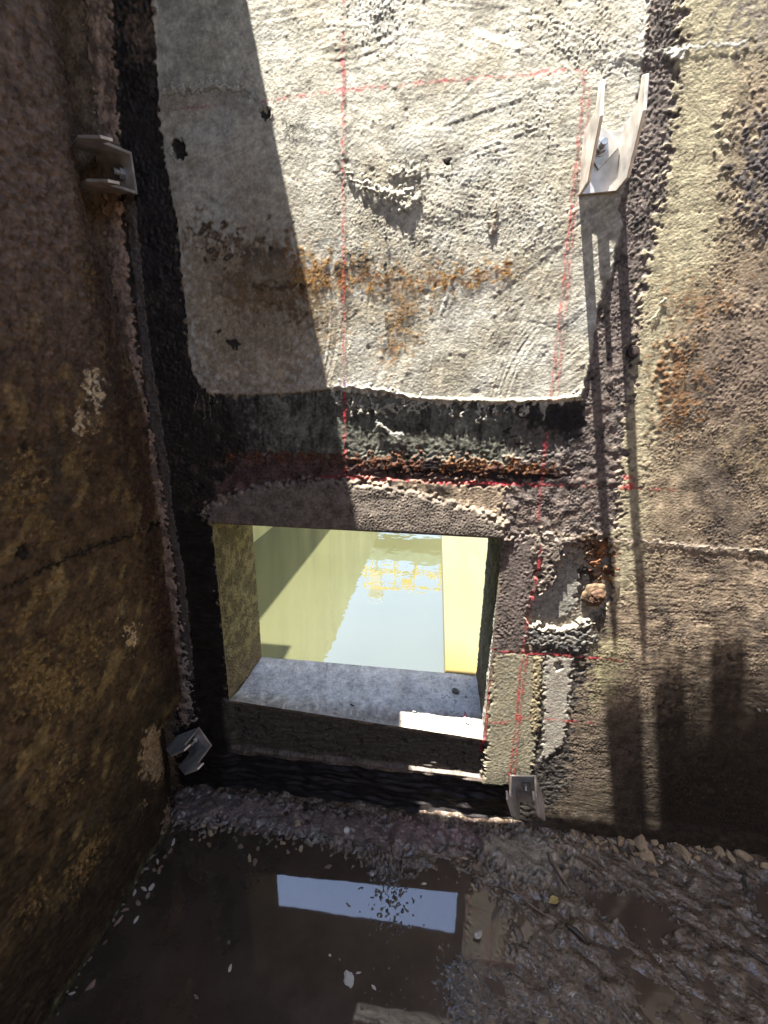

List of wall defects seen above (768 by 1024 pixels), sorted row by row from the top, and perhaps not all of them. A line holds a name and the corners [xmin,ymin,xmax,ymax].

rust [188,221,517,366]
rust [221,447,568,483]
rust [577,534,621,580]
spalling [521,527,620,734]